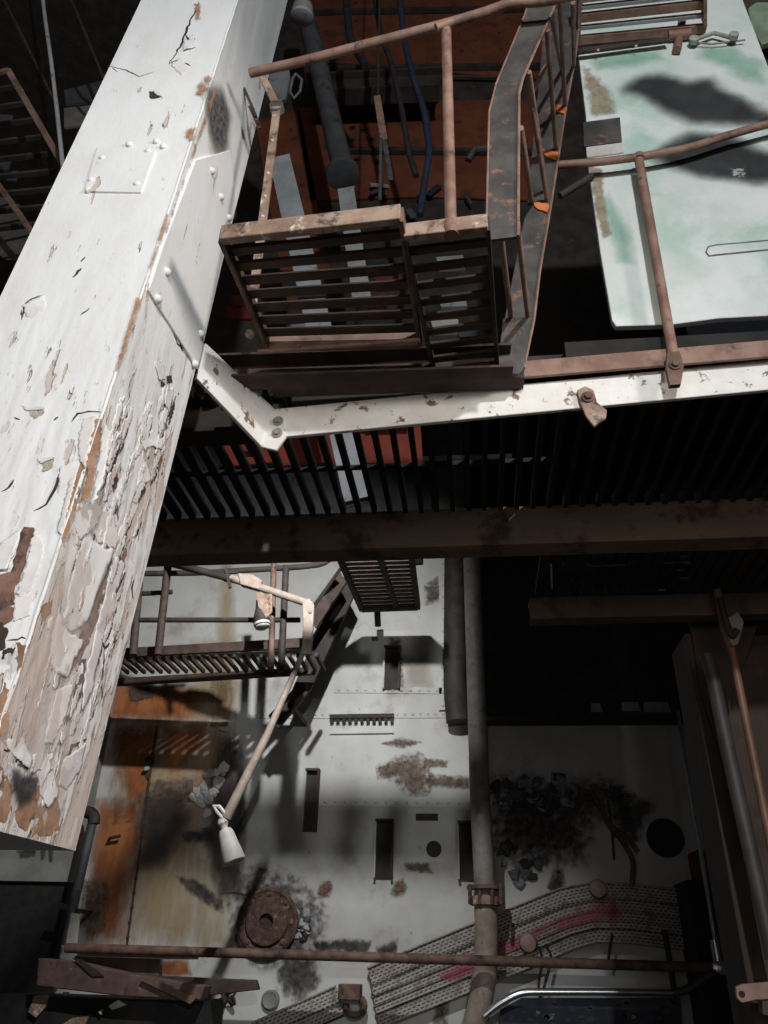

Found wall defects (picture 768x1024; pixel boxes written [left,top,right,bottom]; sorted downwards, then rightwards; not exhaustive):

crack [108,2,199,77]
rust [186,75,218,158]
rust [116,181,184,370]
peeling [0,361,179,837]
rust [82,682,238,941]
rust [383,739,417,748]